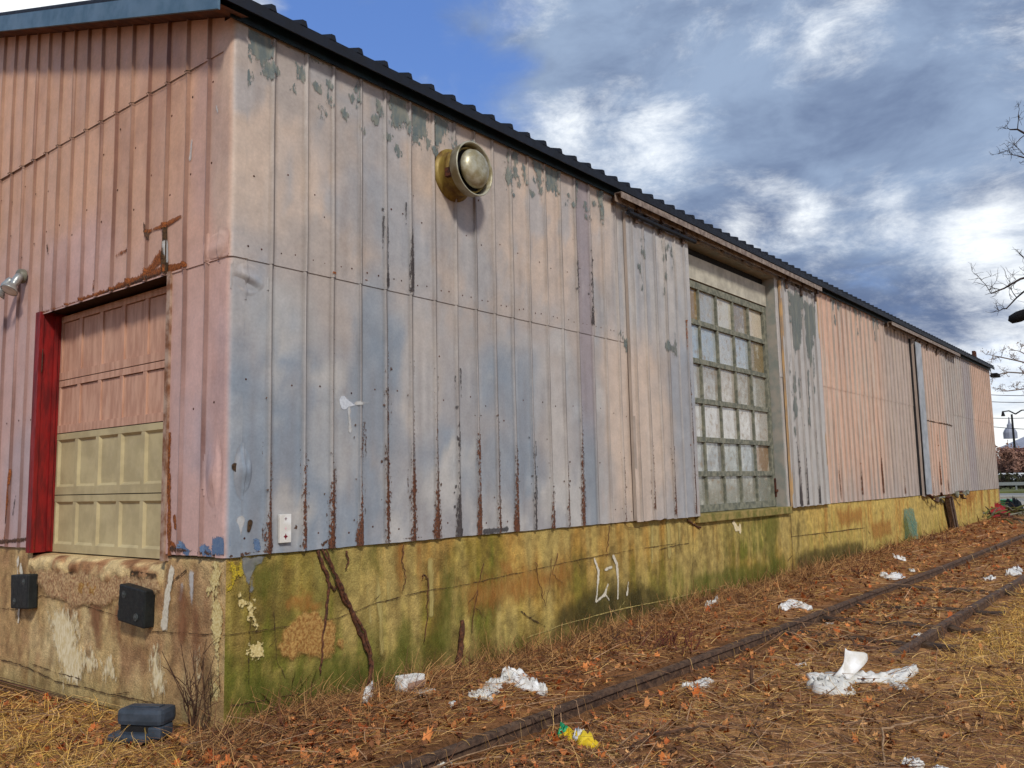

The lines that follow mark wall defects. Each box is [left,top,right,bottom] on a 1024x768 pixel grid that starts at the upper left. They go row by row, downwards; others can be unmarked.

peeling [361,94,457,158]
peeling [505,148,604,225]
corrosion [43,250,165,313]
peeling [788,291,816,436]
corrosion [321,452,337,548]
corrosion [354,481,366,546]
corrosion [381,351,463,565]
corrosion [475,415,586,535]
spalling [37,570,160,607]
peeling [176,537,224,702]
water stain [560,589,659,625]
water stain [797,544,862,566]